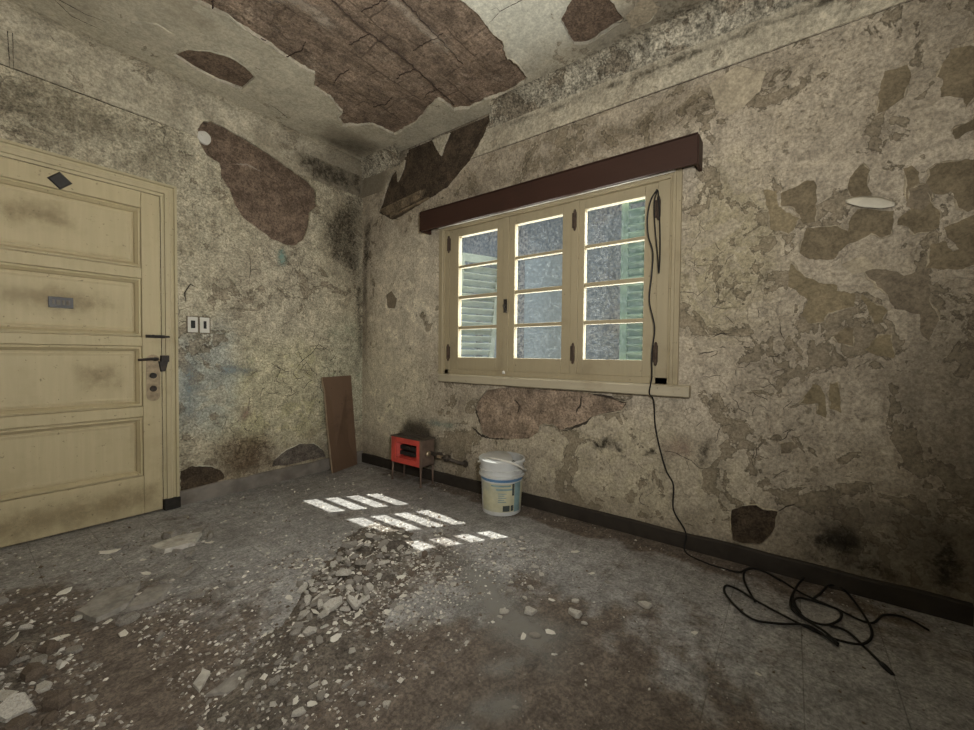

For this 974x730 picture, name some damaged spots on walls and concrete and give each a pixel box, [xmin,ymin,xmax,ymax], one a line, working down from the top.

flaking render [561,0,660,45]
flaking render [177,50,254,87]
flaking render [202,0,528,133]
peeling [875,65,911,117]
peeling [935,45,974,139]
flaking render [198,122,317,246]
flaking render [380,114,490,220]
peeling [764,159,974,340]
flaking render [472,387,628,440]
peeling [798,382,841,418]
flaking render [729,504,795,544]